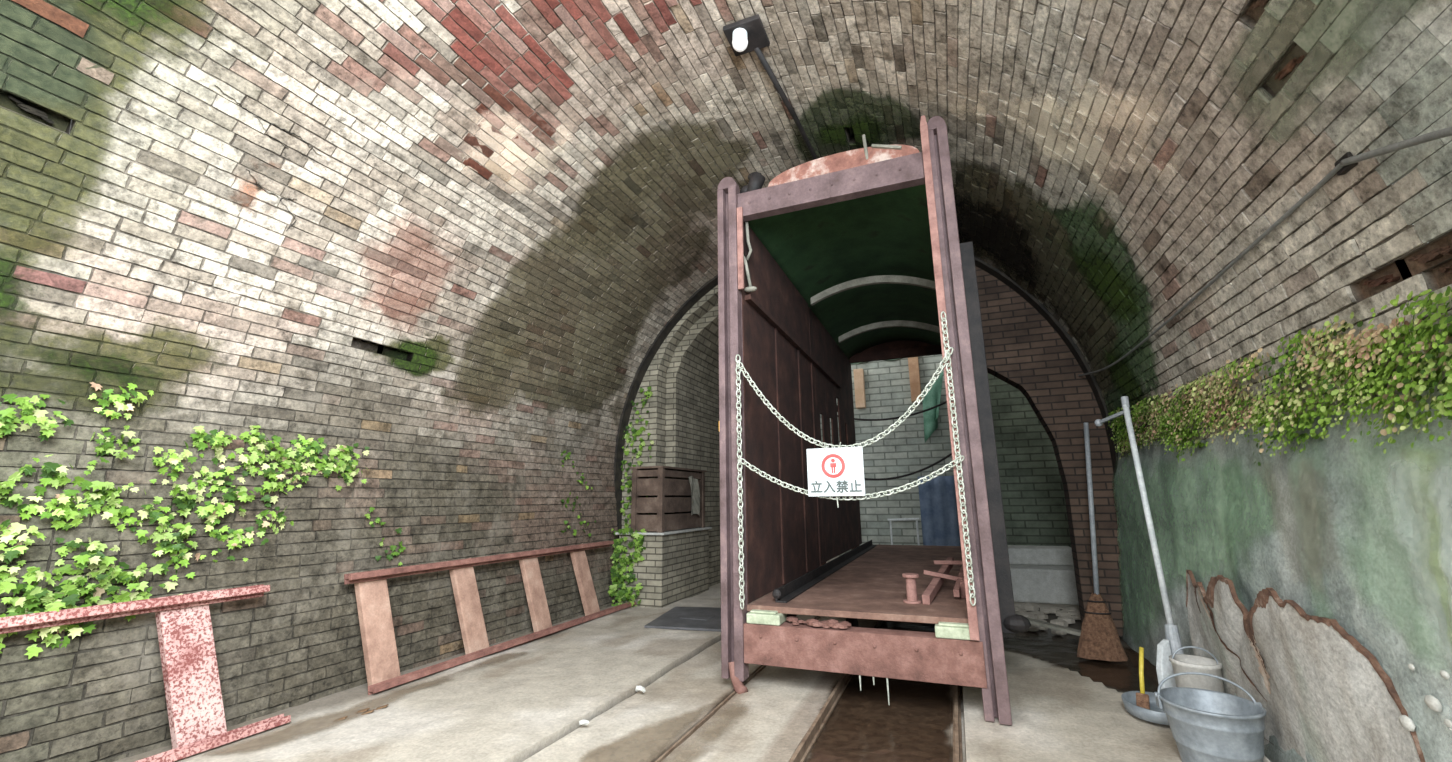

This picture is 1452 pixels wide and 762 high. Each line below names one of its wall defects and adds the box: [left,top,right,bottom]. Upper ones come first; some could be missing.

water stain [451,119,752,416]